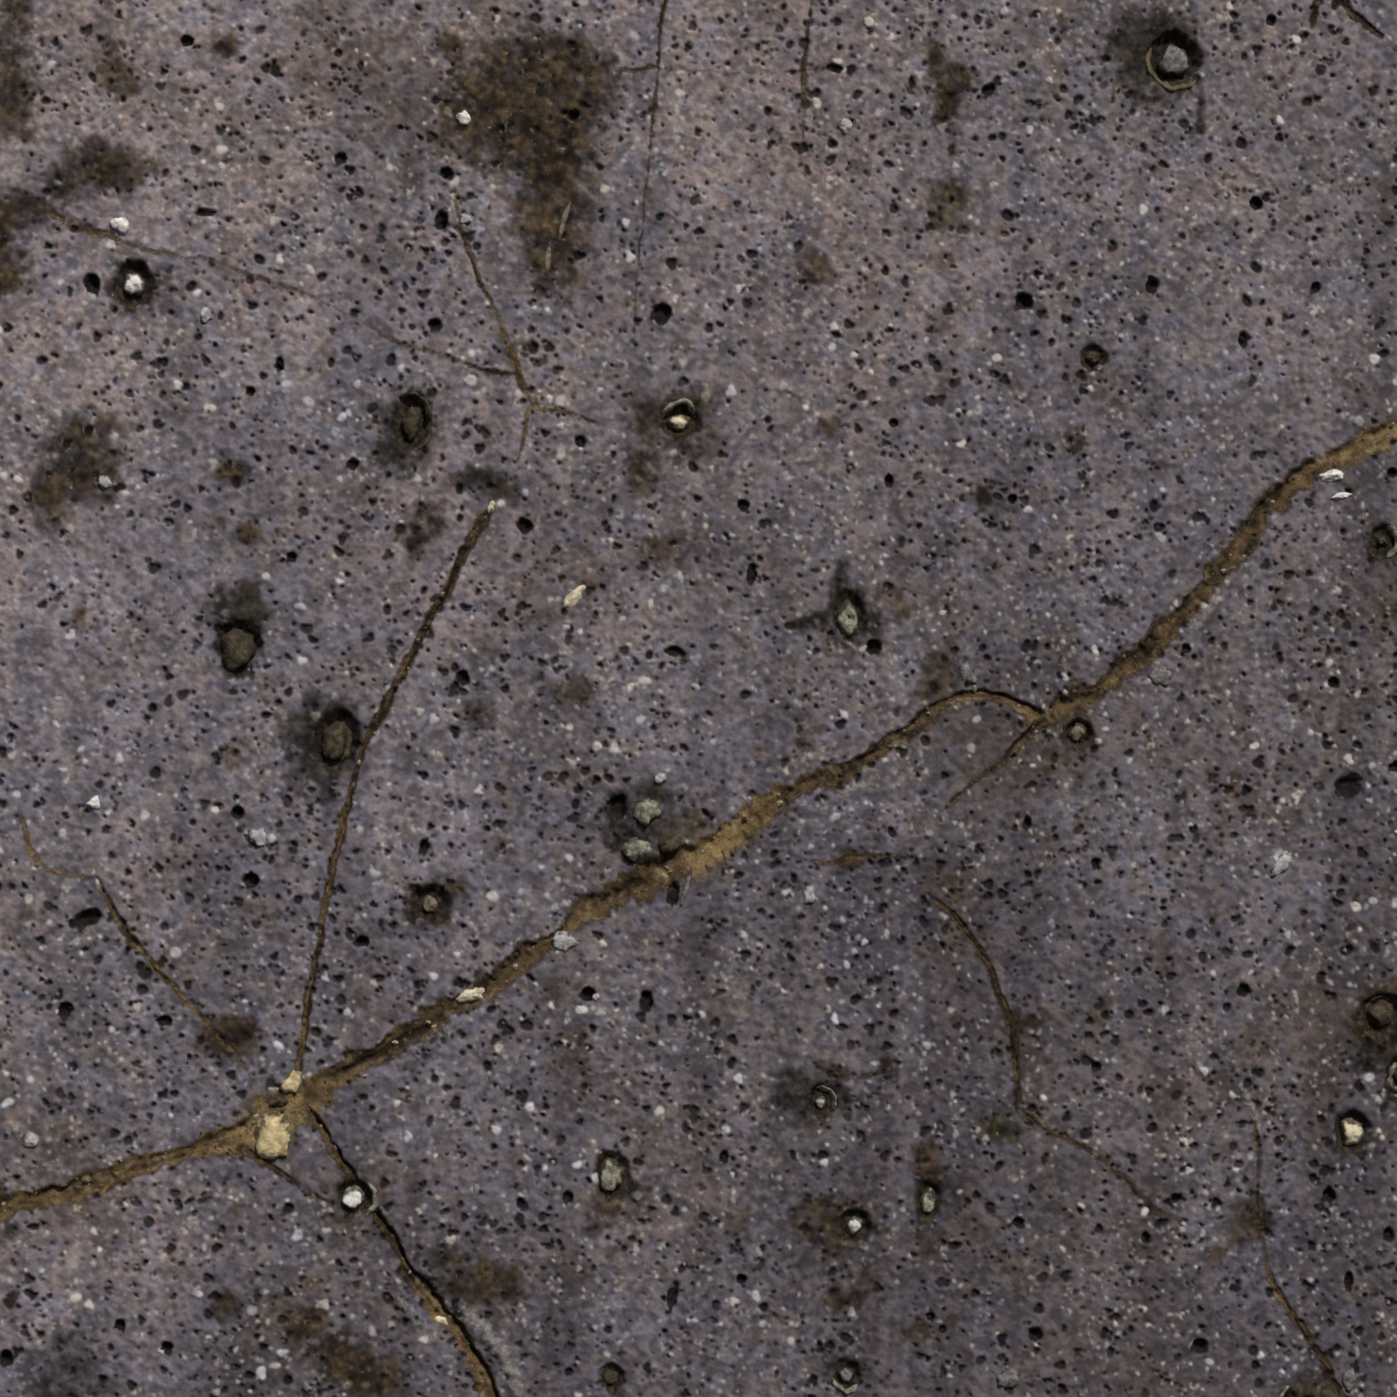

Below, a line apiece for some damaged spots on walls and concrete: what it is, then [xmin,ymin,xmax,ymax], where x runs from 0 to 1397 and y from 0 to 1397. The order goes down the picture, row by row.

water stain [0,271,26,294]
crack [52,194,595,459]
water stain [436,34,620,295]
crack [0,418,1397,1397]